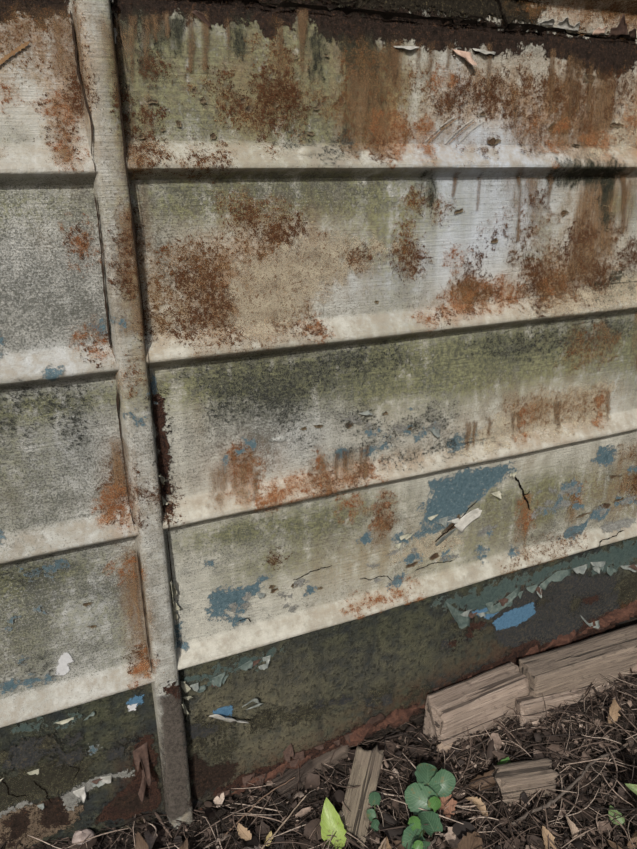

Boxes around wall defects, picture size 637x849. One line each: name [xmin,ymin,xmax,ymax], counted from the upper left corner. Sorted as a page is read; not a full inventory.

rust [0,0,238,183]
rust [188,9,314,160]
peeling [110,0,637,129]
crack [239,0,634,41]
spalling [477,94,520,160]
leakage [545,151,625,229]
crack [112,8,173,582]
rust [60,35,637,543]
crack [514,477,530,510]
peeling [431,478,637,654]
peeling [0,742,151,849]
peeling [179,646,394,807]